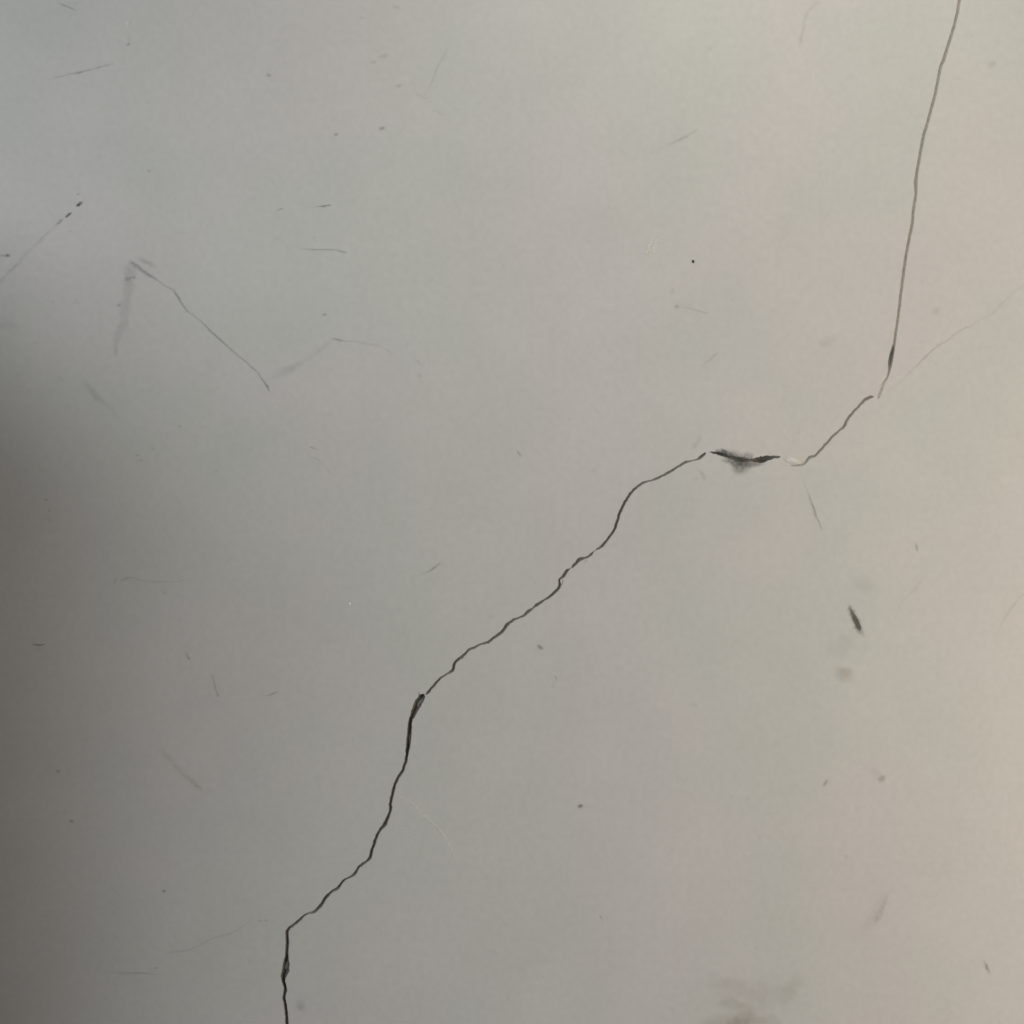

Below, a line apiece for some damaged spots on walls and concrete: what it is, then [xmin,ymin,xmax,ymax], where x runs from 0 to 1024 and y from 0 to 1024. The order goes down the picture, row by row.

crack [784,0,961,467]
crack [281,452,706,1024]